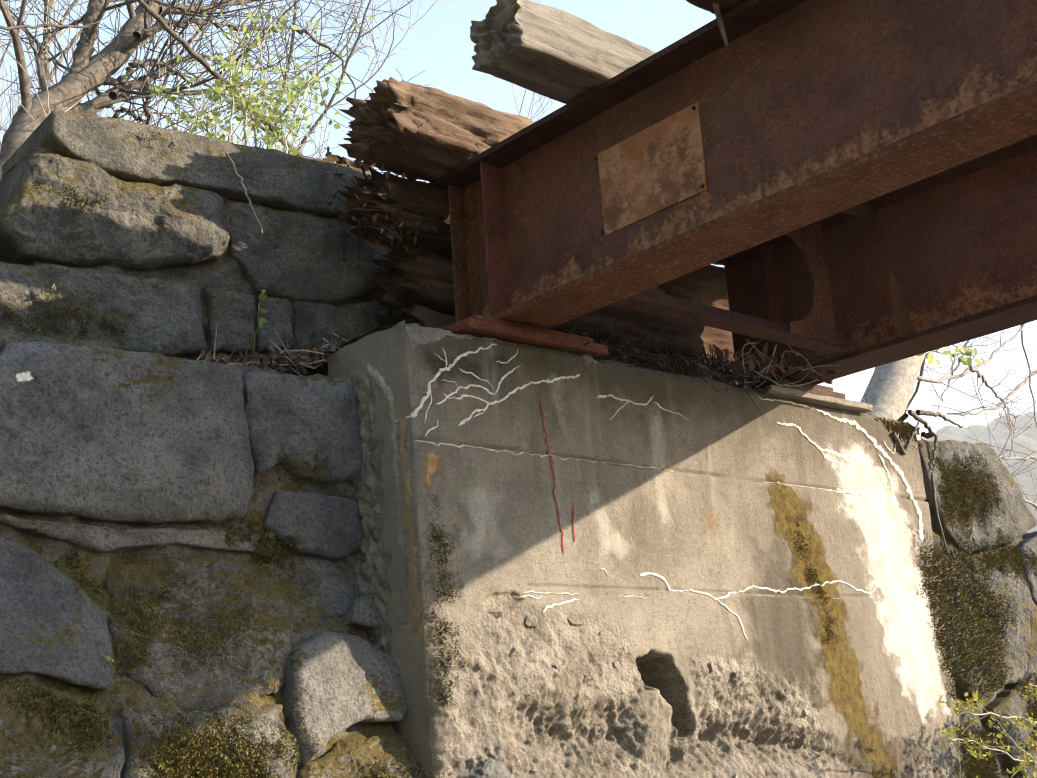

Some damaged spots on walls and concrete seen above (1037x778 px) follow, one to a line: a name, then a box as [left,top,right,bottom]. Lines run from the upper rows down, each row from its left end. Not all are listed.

corrosion [366,364,417,586]
crack [395,343,687,472]
crack [777,422,863,465]
crack [763,481,883,499]
crack [513,590,582,612]
crack [600,568,877,641]
damp [758,396,950,723]
spalling [435,592,854,778]